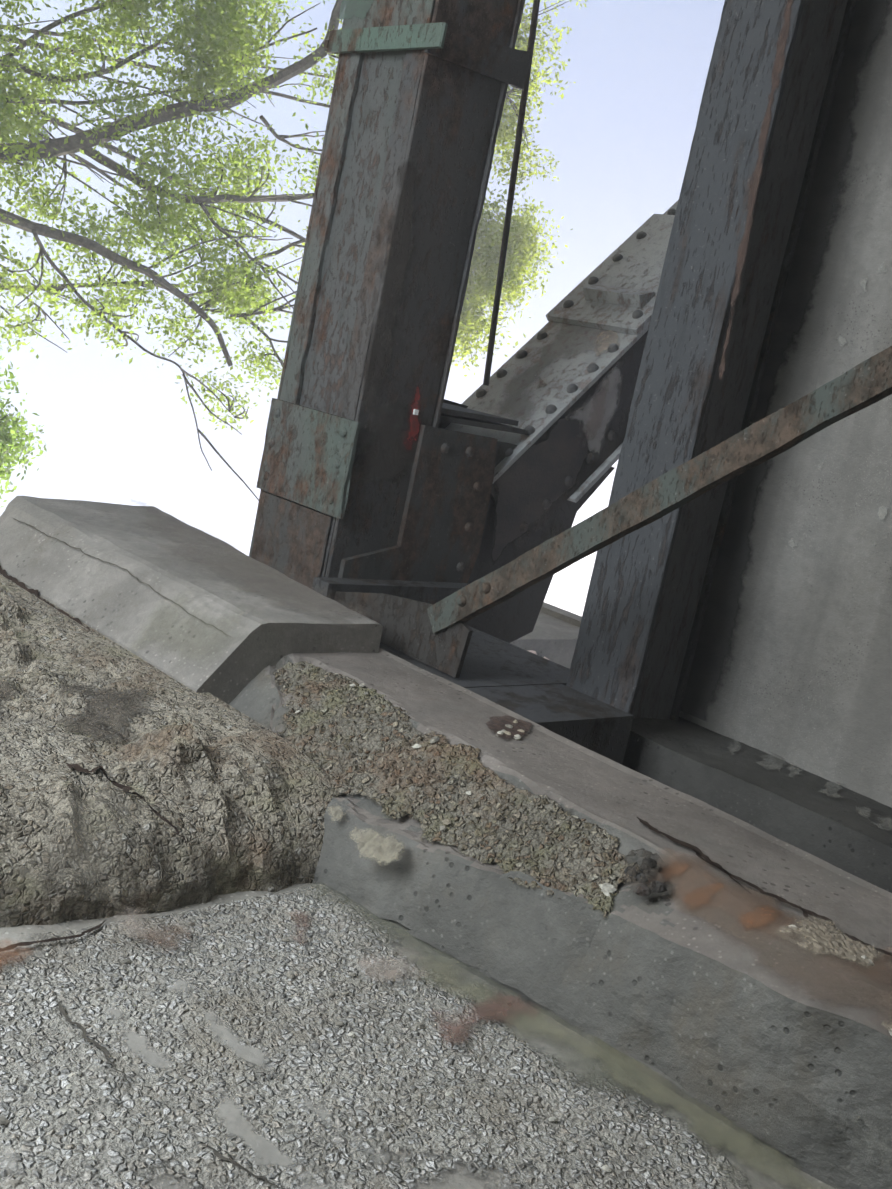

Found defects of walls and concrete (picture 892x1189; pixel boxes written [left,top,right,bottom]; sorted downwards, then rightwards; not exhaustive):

corrosion [363,162,416,408]
corrosion [491,417,589,563]
crack [0,518,231,637]
crack [65,763,187,846]
spalling [273,661,630,918]
corrosion [624,848,688,896]
crack [637,817,892,956]
spalling [0,884,751,1189]